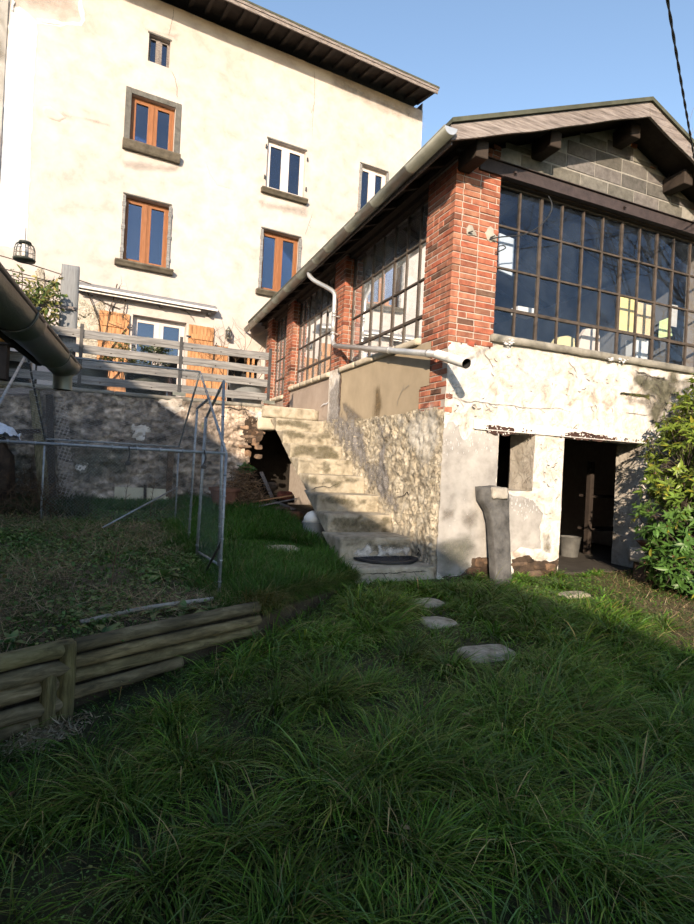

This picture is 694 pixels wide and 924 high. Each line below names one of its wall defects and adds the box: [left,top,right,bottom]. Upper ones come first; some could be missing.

crack [37,0,85,27]
damp [634,371,689,425]
peeling [486,425,536,436]
peeling [560,431,642,444]
flaking render [511,555,559,577]